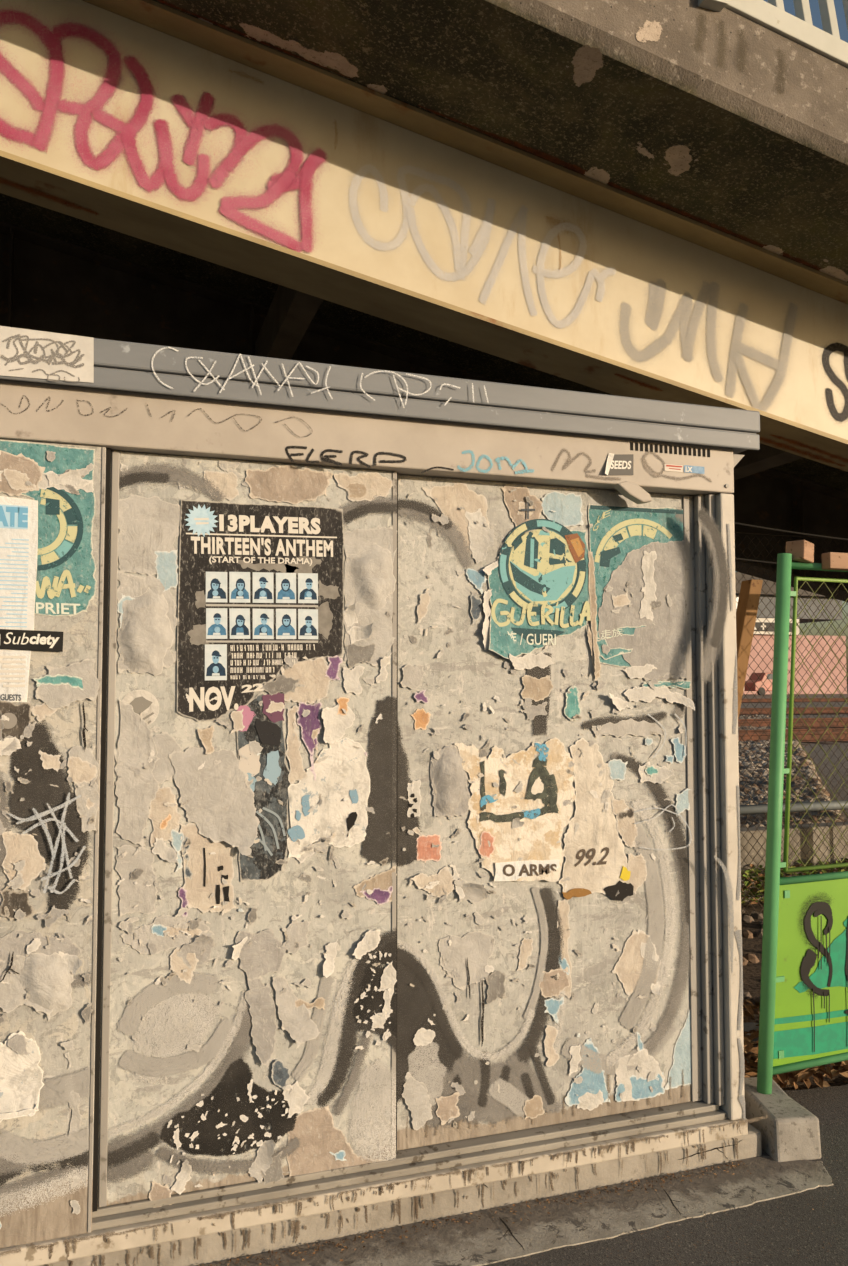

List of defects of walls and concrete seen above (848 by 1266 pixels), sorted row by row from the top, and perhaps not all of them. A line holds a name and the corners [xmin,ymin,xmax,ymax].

spalling [239,22,388,94]
spalling [566,45,603,87]
spalling [630,20,667,43]
spalling [637,142,699,176]
peeling [502,485,593,534]
peeling [117,456,393,668]
peeling [409,483,501,650]
peeling [0,658,100,1026]
peeling [112,525,696,1208]
peeling [7,1035,30,1055]
peeling [65,1163,82,1214]
crack [478,1183,525,1251]